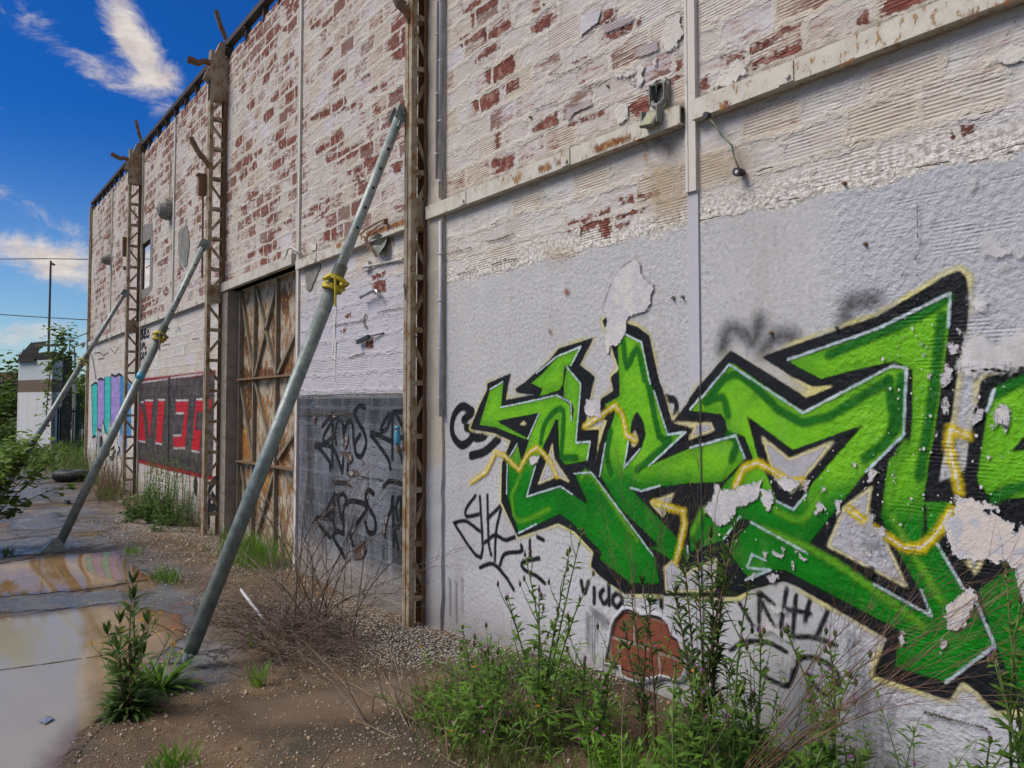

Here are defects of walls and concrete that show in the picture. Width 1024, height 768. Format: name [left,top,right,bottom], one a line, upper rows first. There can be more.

peeling [459,0,520,112]
peeling [316,132,379,186]
peeling [532,110,604,132]
peeling [237,191,337,266]
peeling [568,188,669,239]
peeling [603,257,654,353]
rust [242,289,293,460]
rust [255,438,291,524]
peeling [704,464,902,579]
peeling [908,485,1024,603]
flaking render [600,604,687,686]
peeling [940,588,978,655]